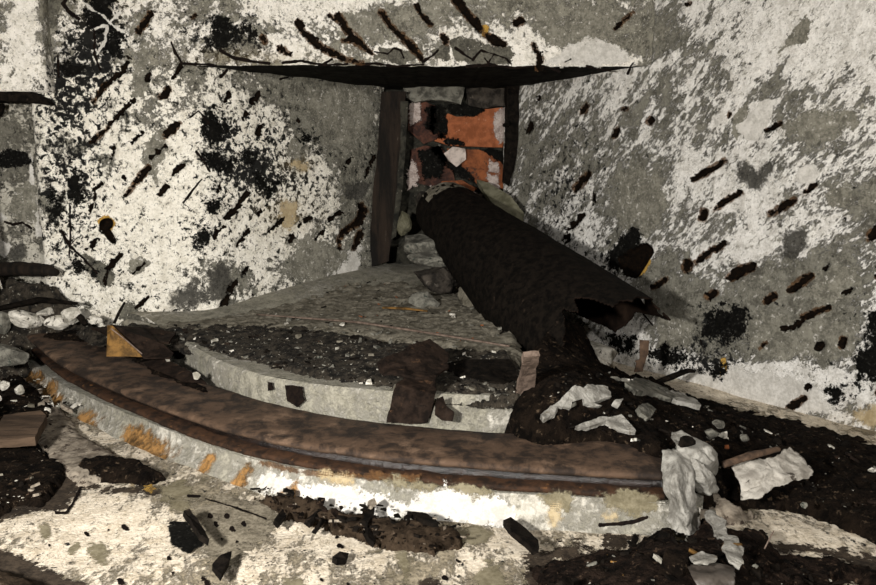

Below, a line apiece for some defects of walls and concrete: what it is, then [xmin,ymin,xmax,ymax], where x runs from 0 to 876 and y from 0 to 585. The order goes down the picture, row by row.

crack [54,55,62,78]
crack [61,0,101,71]
spalling [241,90,261,121]
leakage [196,104,289,199]
spalling [444,147,466,167]
peeling [604,167,672,279]